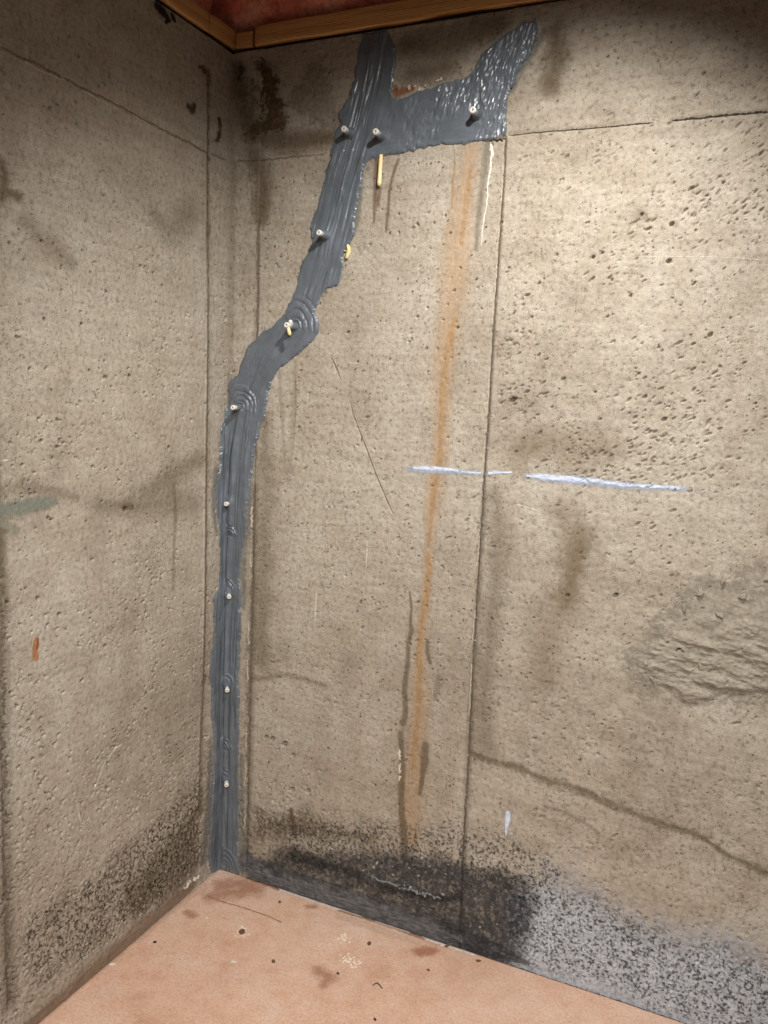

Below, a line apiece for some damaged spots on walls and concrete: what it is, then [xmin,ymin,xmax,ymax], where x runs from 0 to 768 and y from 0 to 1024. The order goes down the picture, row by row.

damp [26,783,207,983]
damp [268,818,768,1024]
crack [472,753,768,875]